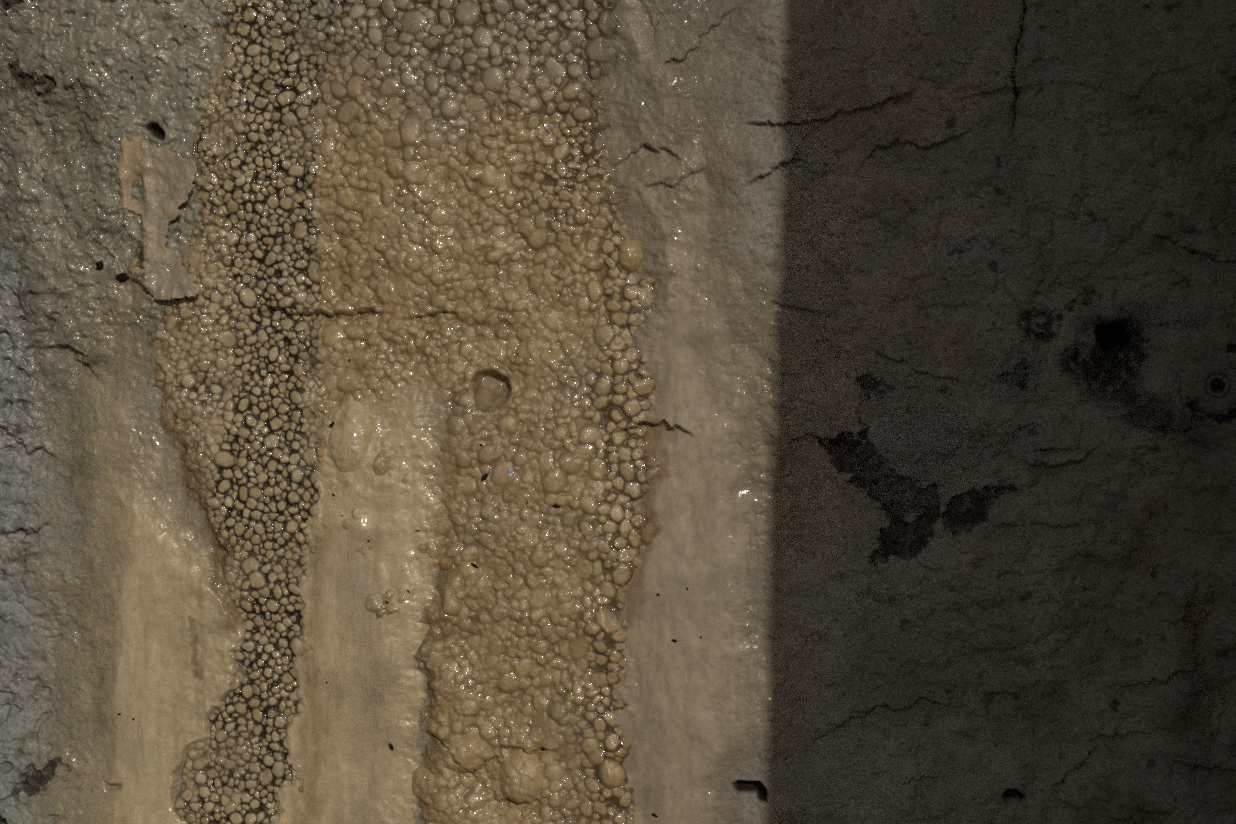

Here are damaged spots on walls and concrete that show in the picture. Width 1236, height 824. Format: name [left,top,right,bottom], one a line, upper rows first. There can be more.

crack [651,23,720,64]
crack [973,0,1236,130]
peeling [113,131,200,300]
damp [0,0,789,824]
spalling [818,431,1017,562]